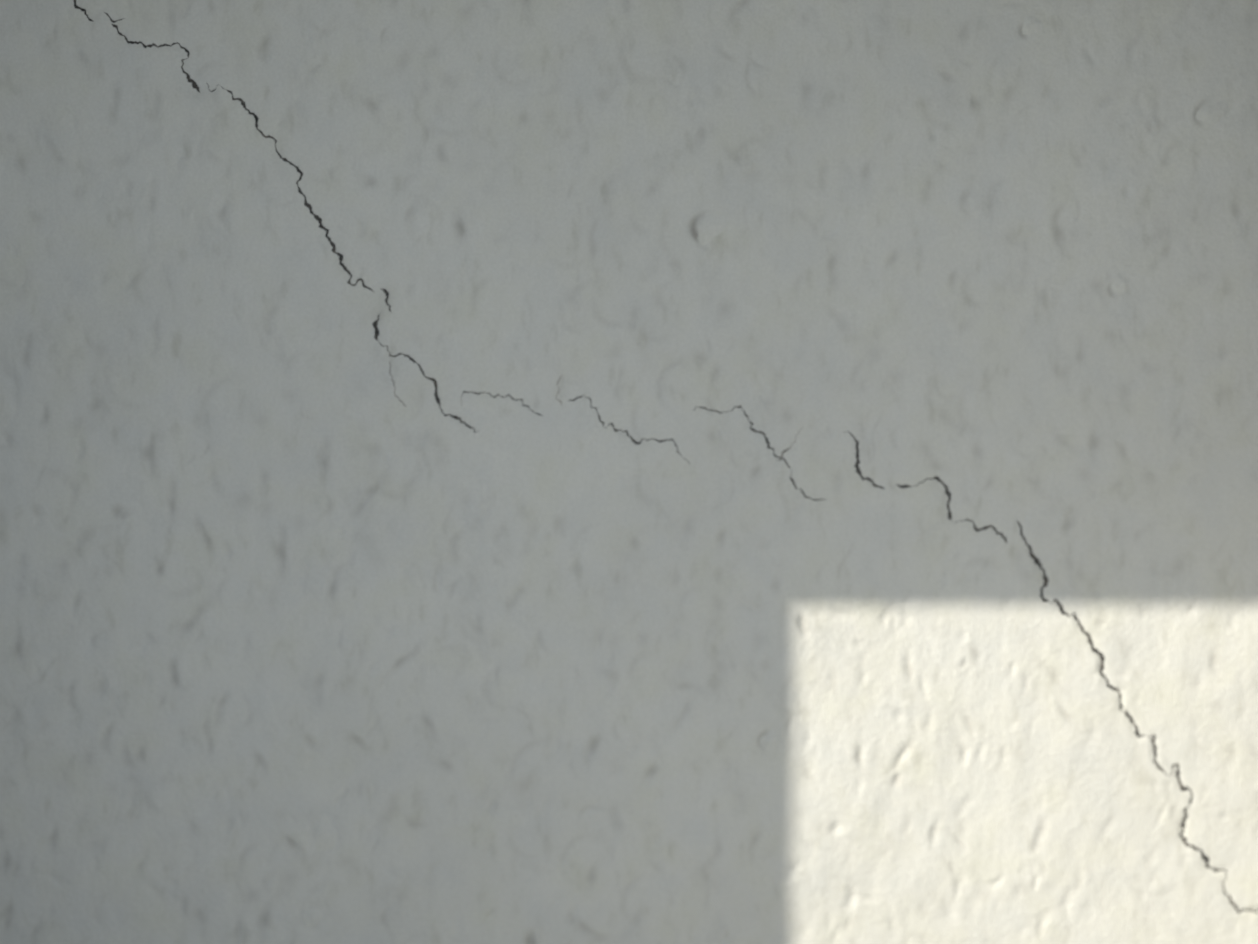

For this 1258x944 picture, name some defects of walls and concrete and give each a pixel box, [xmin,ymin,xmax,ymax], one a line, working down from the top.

crack [73,0,689,463]
crack [693,406,825,501]
crack [848,431,1258,914]